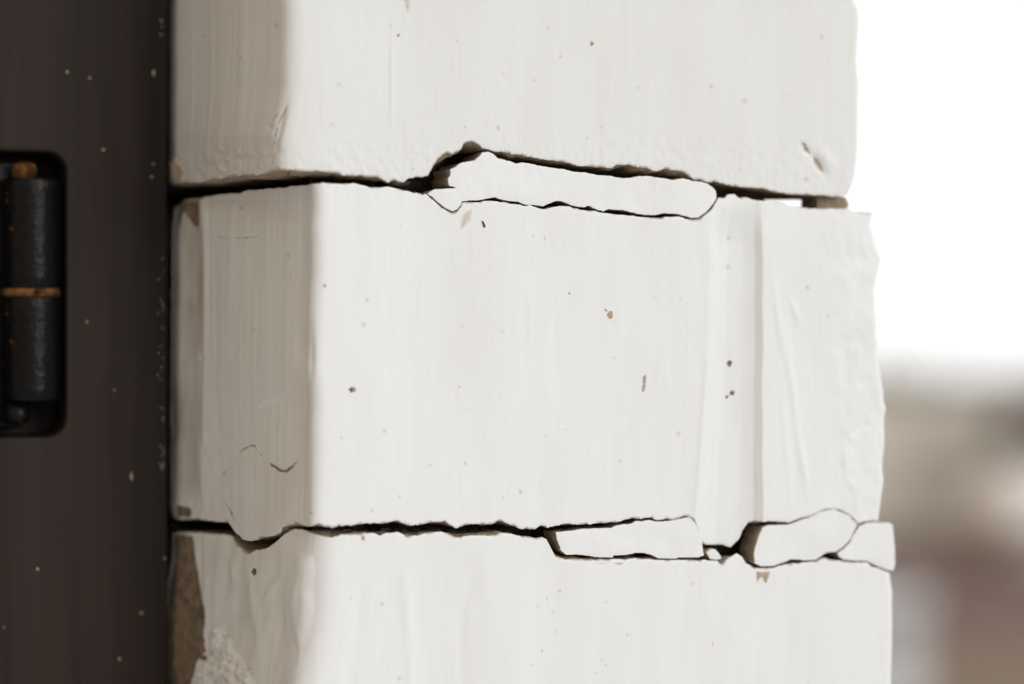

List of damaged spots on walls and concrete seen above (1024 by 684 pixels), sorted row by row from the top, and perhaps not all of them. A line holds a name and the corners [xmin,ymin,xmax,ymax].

crack [239,153,474,193]
crack [312,522,604,554]
crack [702,522,772,556]
peeling [169,534,256,684]